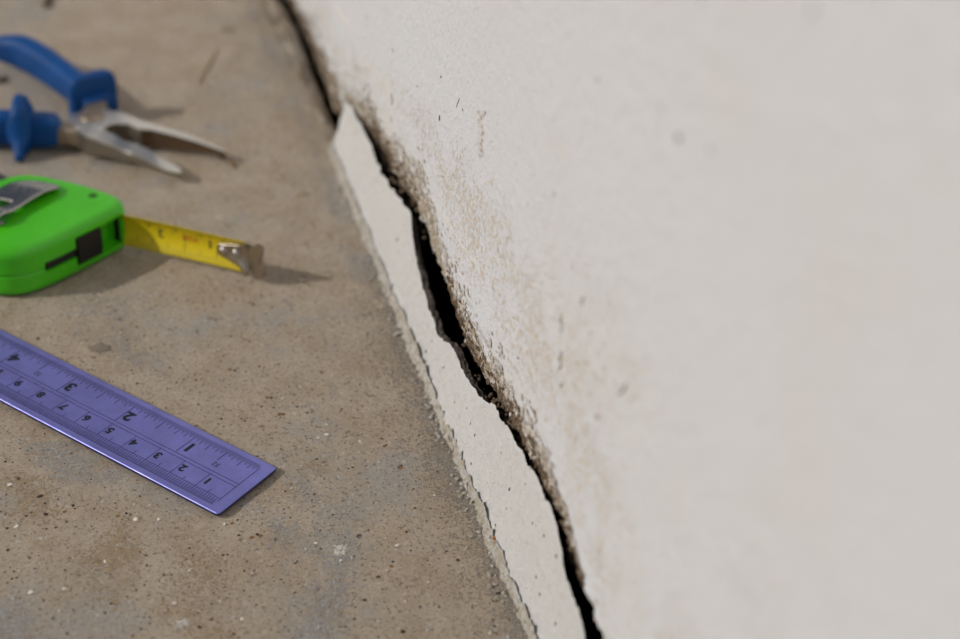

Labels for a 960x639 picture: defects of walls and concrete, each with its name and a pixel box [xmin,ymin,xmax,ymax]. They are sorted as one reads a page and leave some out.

crack [278,0,341,132]
crack [364,89,498,402]
peeling [289,0,583,579]
crack [513,406,603,639]